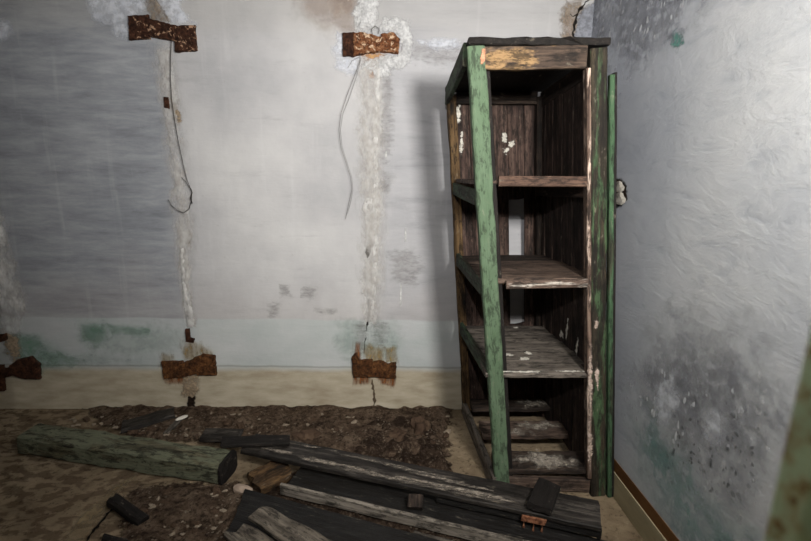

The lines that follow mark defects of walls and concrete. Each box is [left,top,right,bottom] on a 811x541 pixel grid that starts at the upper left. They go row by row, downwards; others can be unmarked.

crack [570,0,589,37]